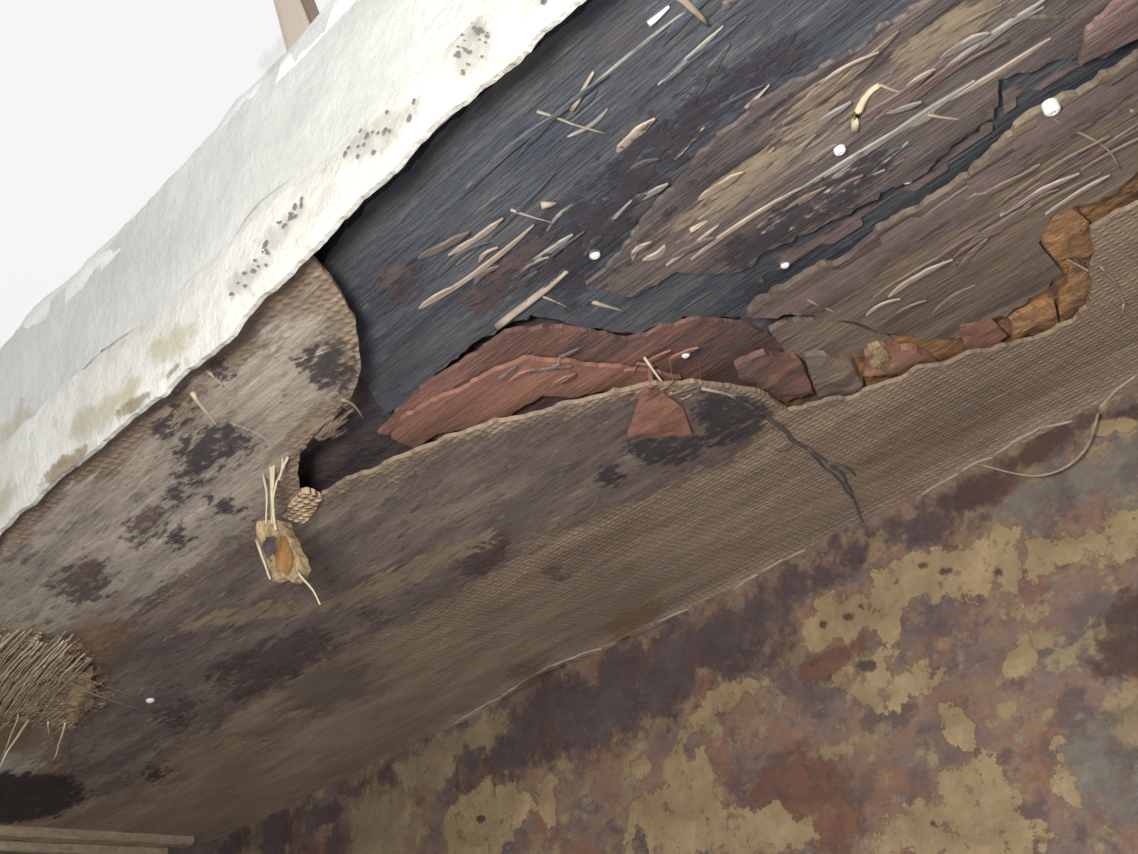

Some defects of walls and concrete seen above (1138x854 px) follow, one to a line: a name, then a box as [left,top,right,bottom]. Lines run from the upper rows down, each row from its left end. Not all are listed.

water stain [343,110,390,159]
water stain [229,240,269,296]
water stain [276,196,303,229]
water stain [289,337,372,453]
crack [732,393,863,523]
peeling [1090,415,1138,437]
rust [275,535,293,574]
water stain [45,390,782,808]
peeling [800,505,1138,854]
peeling [392,705,559,854]
peeling [622,671,822,854]
rust [747,746,863,854]